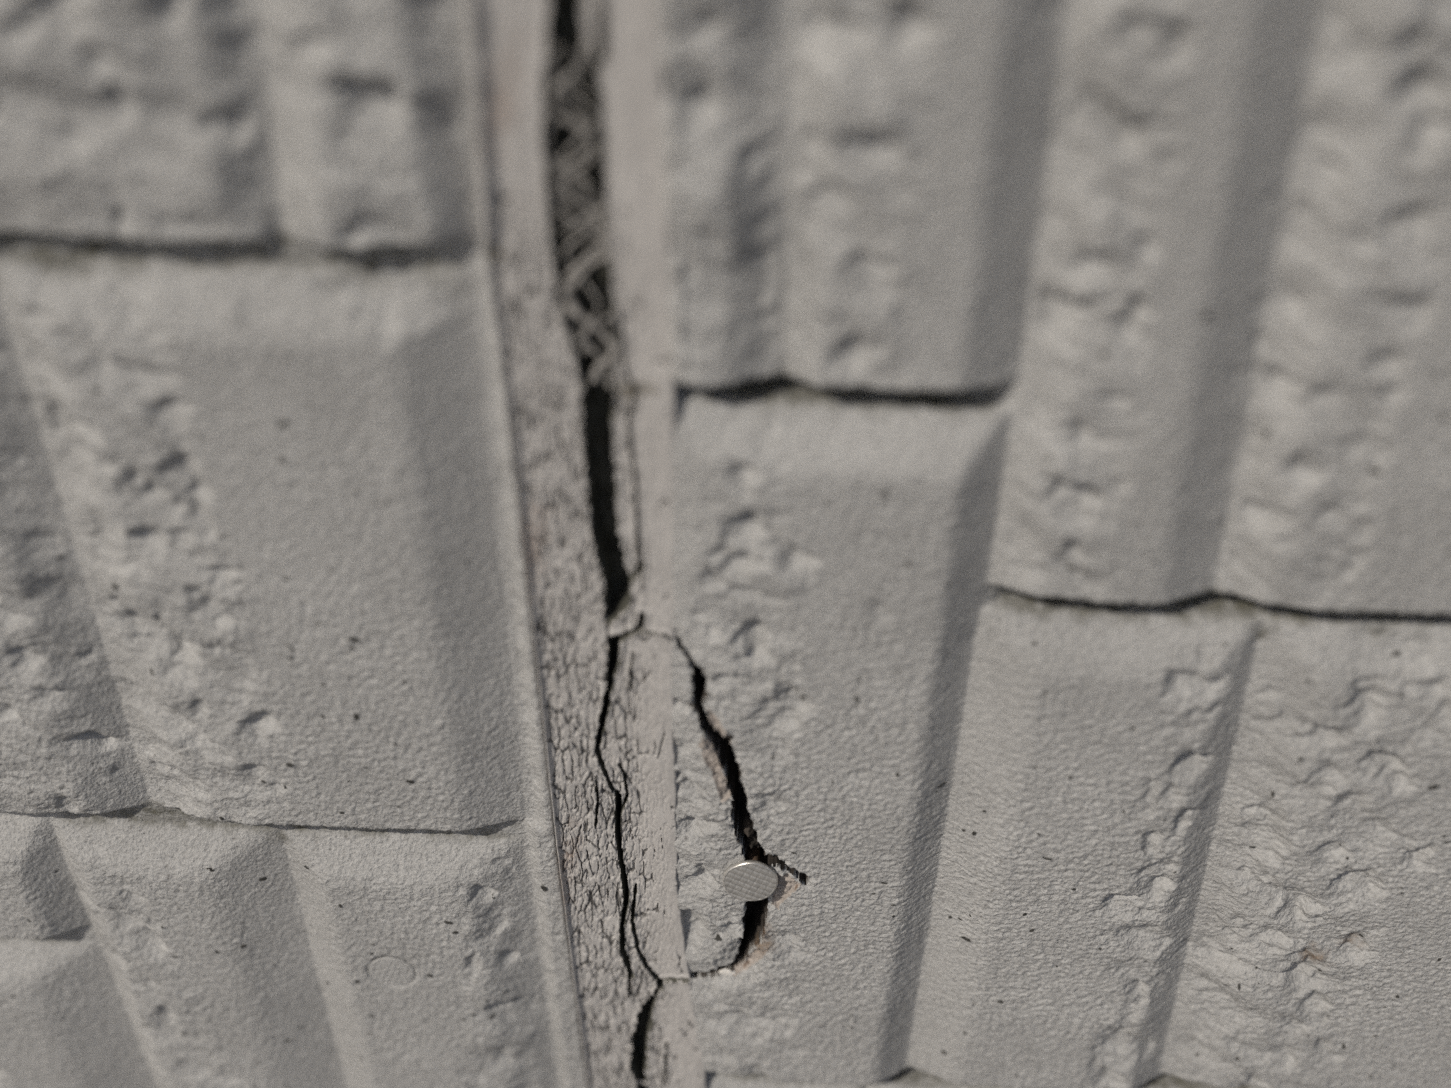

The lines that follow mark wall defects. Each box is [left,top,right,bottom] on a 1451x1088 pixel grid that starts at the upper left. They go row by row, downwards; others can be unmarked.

crack [488,184,810,1088]